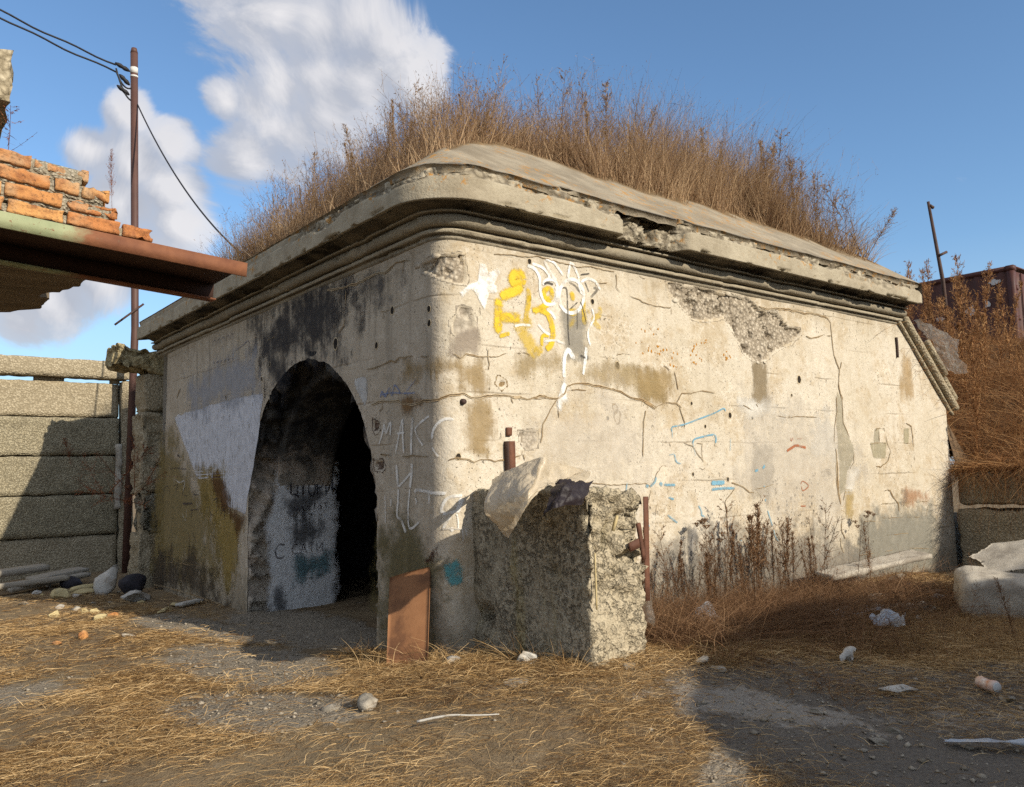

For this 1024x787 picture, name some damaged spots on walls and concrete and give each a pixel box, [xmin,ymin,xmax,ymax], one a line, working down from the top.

spalling [414,251,470,286]
spalling [665,280,802,364]
water stain [150,429,241,607]
water stain [436,362,493,453]
crack [371,366,714,529]
water stain [581,364,672,402]
water stain [738,363,771,417]
crack [744,306,929,555]
water stain [846,467,859,493]